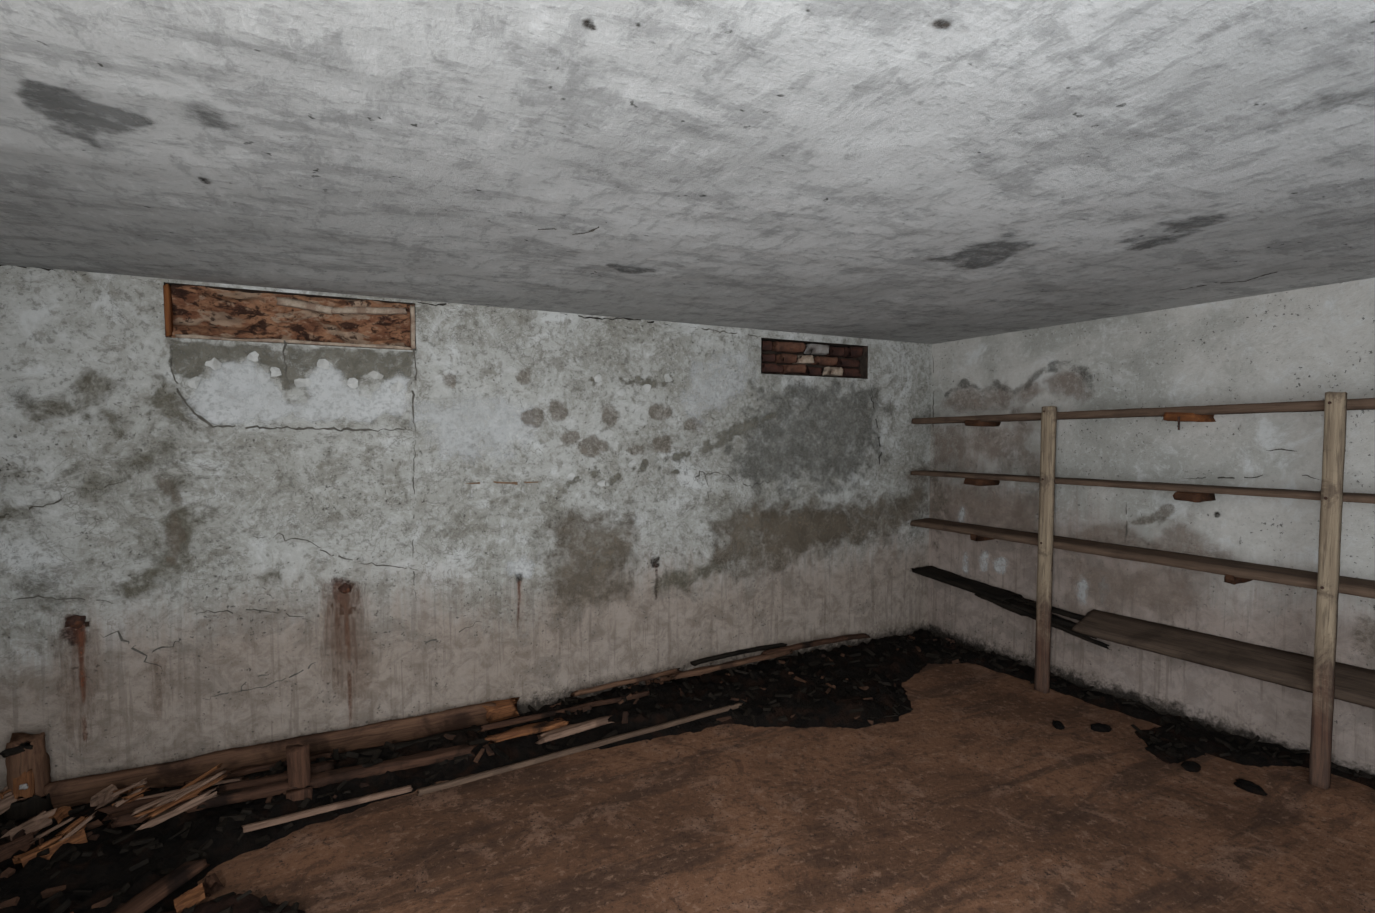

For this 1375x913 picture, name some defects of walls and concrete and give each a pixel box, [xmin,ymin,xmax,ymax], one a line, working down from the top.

flaking render [169,340,414,391]
water stain [658,354,1037,588]
water stain [548,511,634,615]
corrosion [331,578,355,653]
corrosion [62,616,85,698]